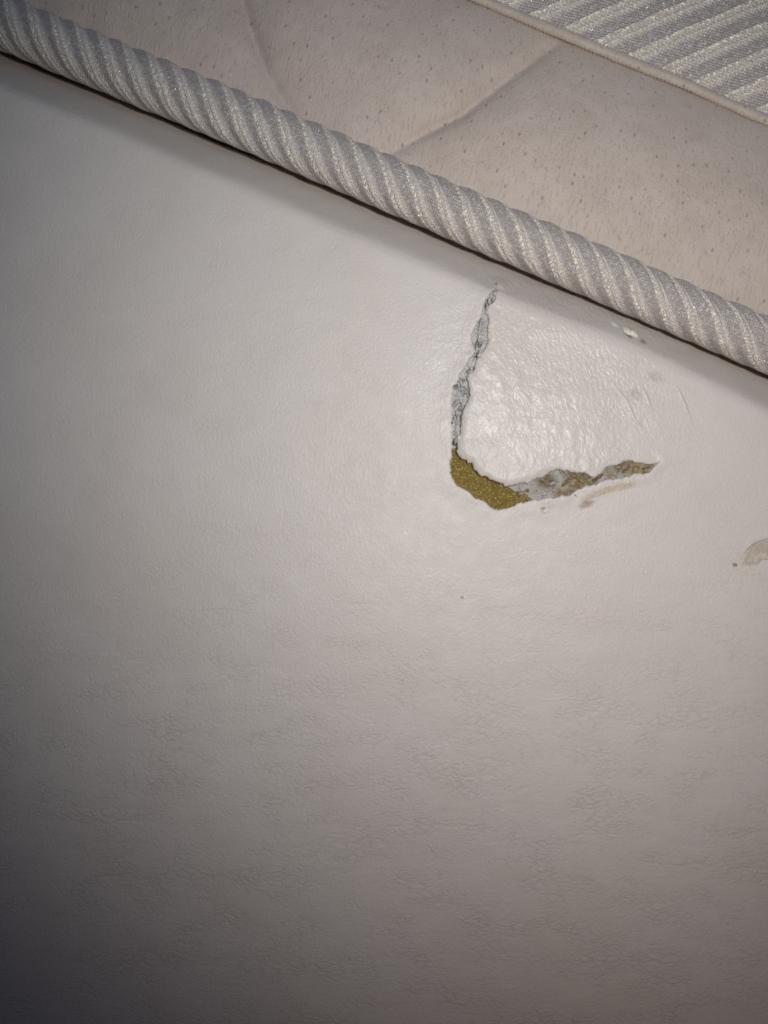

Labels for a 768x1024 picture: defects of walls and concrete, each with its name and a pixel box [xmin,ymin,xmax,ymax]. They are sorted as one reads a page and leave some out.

peeling [610,322,644,343]